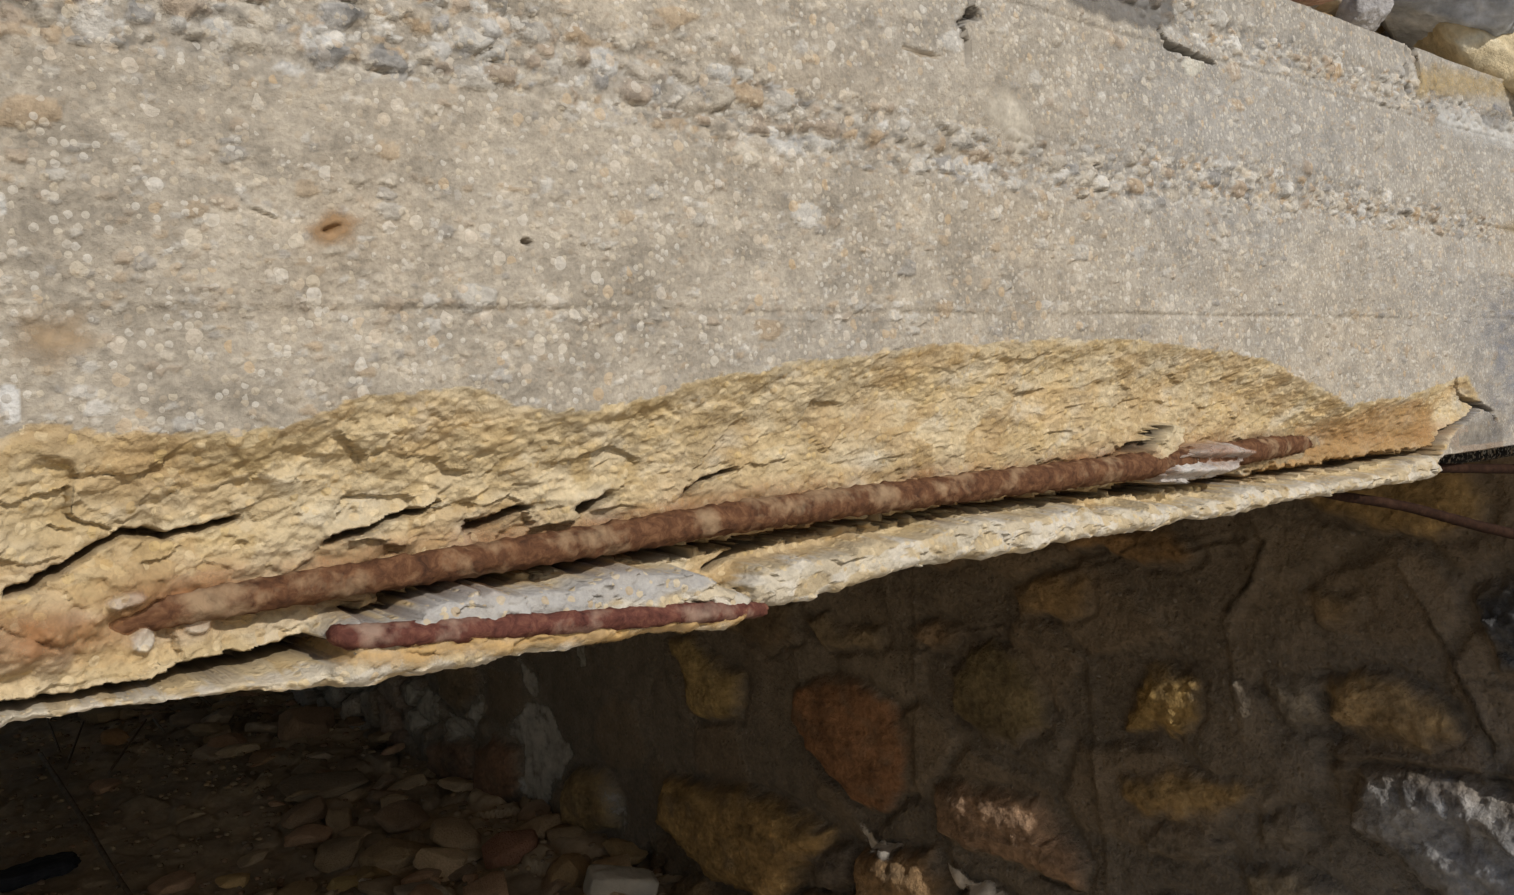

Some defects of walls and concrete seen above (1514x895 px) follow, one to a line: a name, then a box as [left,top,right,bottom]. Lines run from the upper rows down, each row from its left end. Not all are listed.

crack [681,468,739,498]
crack [324,502,535,543]
crack [575,494,612,514]
spalling [0,336,1514,728]
crack [3,516,242,596]
rust [143,574,239,610]
rust [0,622,98,661]
rust [301,616,745,663]